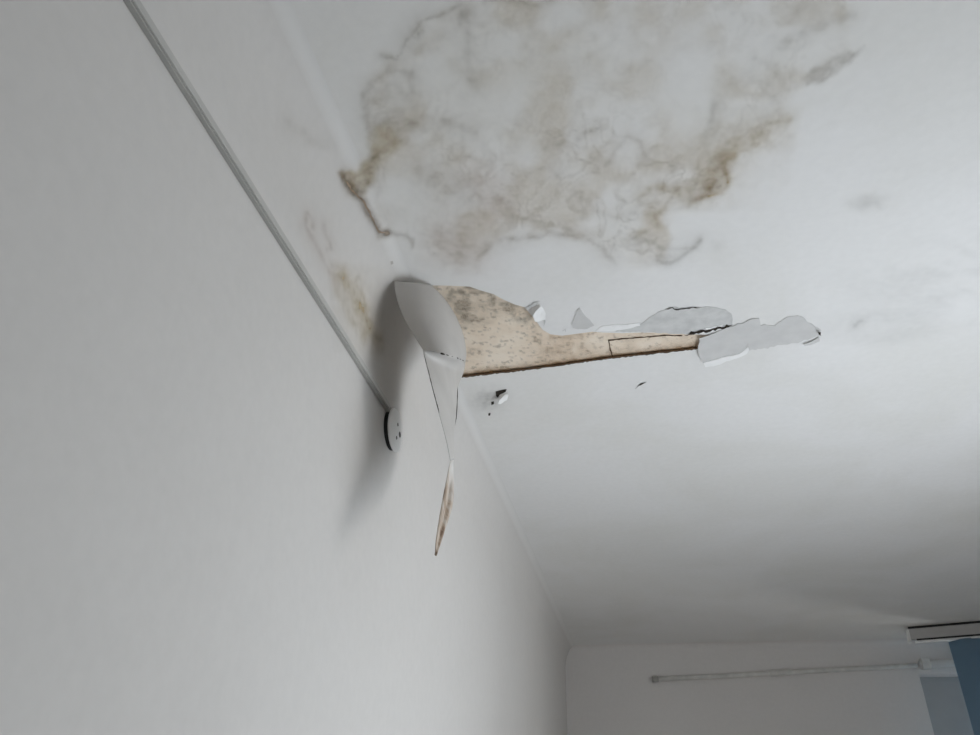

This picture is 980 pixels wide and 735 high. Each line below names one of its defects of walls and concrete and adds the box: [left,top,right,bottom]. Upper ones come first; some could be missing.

spalling [395,281,821,556]